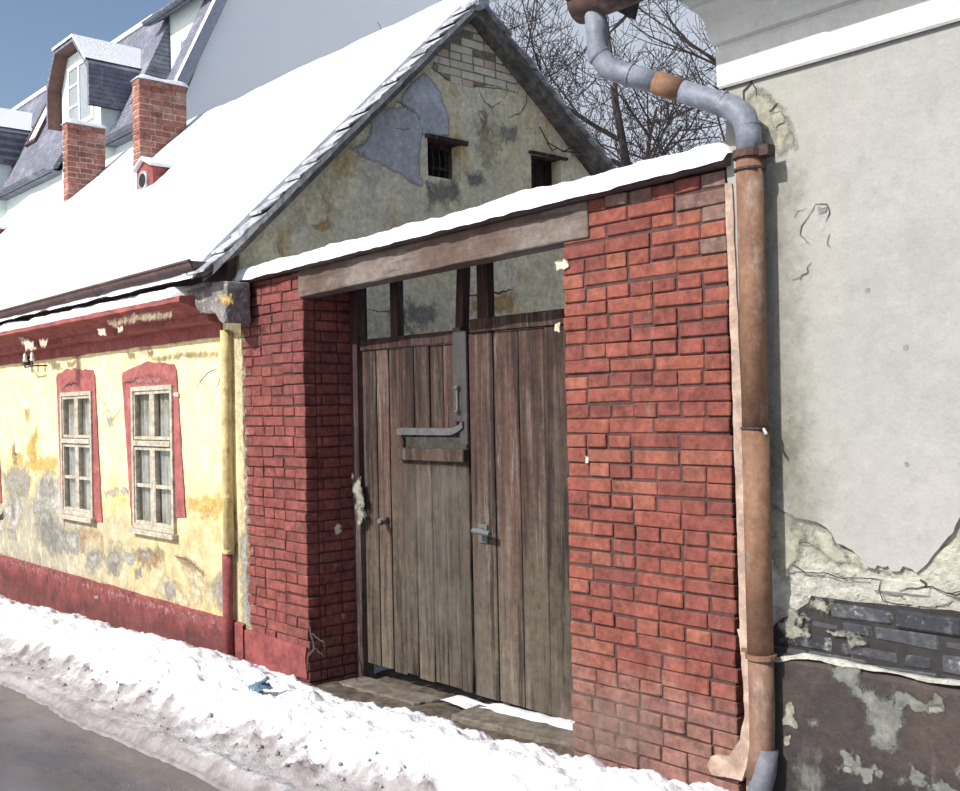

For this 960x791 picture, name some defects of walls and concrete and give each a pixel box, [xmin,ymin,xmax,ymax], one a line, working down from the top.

flaking render [431,24,526,93]
crack [478,87,527,118]
peeling [746,88,798,156]
peeling [97,312,172,336]
peeling [0,431,65,539]
peeling [352,474,366,525]
peeling [0,547,222,630]
flaking render [771,501,960,755]
leakage [794,753,822,791]
peeling [836,749,884,784]
peeling [898,762,960,791]